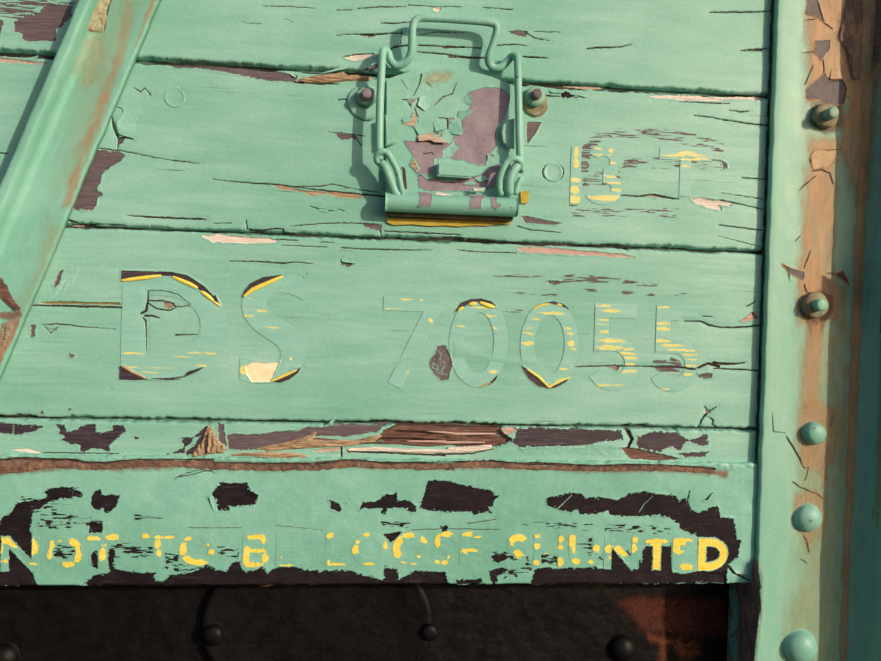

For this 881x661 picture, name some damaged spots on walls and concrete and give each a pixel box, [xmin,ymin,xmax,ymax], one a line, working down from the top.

crack [336,5,546,133]
crack [99,148,385,199]
crack [68,215,635,264]
crack [621,192,679,200]
rust [798,164,842,490]
rust [807,0,881,661]
peeling [0,486,120,586]
peeling [209,482,259,512]
peeling [85,491,751,661]
peeling [358,479,499,515]
rust [621,596,728,661]
rust [737,561,762,661]